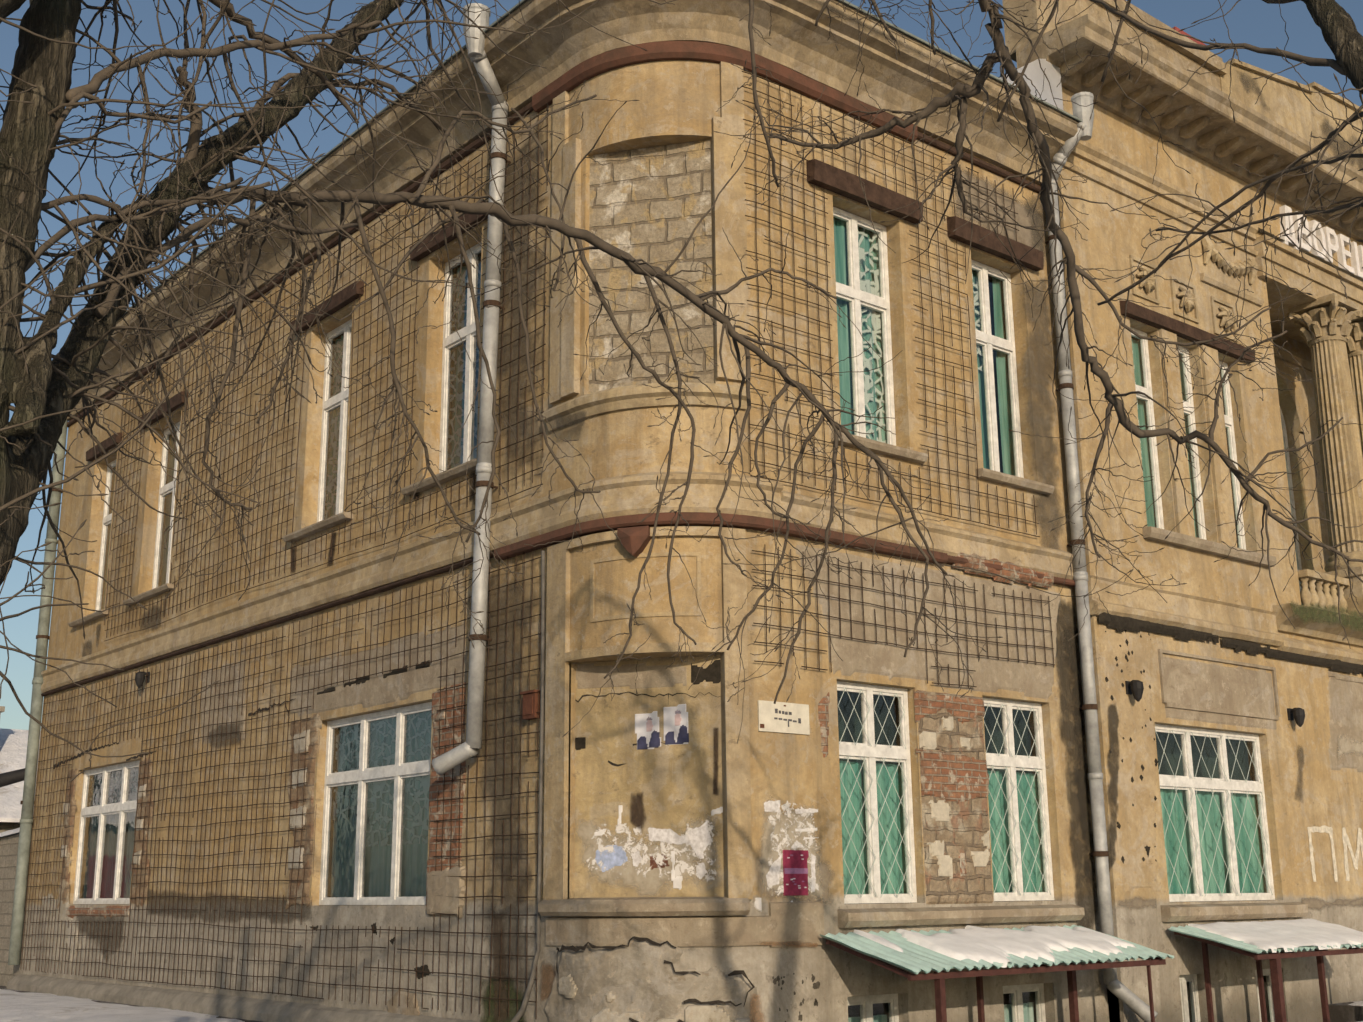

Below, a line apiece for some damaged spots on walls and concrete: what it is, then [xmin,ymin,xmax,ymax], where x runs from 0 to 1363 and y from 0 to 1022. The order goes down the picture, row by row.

spalling [952,553,1054,588]
flaking render [285,712,322,912]
flaking render [426,682,466,906]
damp [482,576,531,995]
flaking render [914,690,993,904]
flaking render [544,939,757,1022]
crack [556,936,755,1022]
spalling [772,973,820,1022]